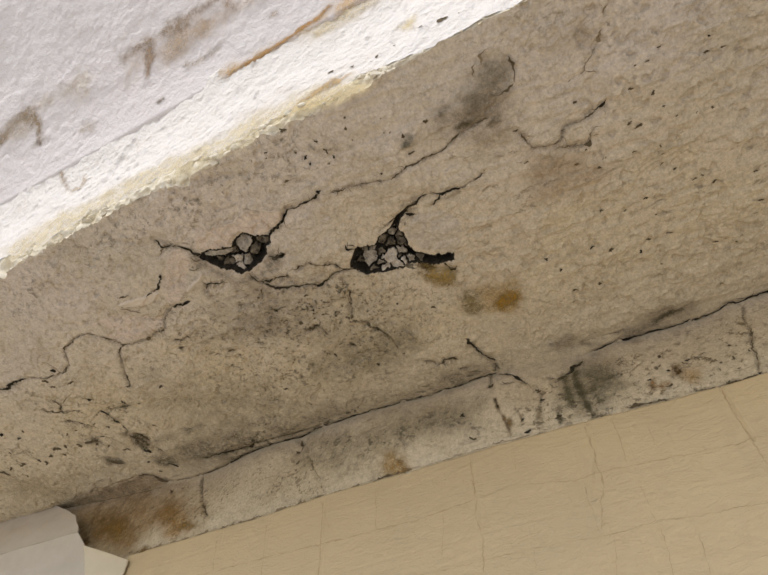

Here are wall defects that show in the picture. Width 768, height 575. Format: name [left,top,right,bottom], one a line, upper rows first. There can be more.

rust [226,0,352,73]
spalling [447,0,527,39]
spalling [0,46,434,279]
crack [518,98,607,157]
crack [251,116,489,348]
spalling [349,209,455,275]
spalling [92,232,271,342]
rust [463,285,520,314]
crack [0,301,191,453]
crack [106,290,768,520]
water stain [556,369,602,416]